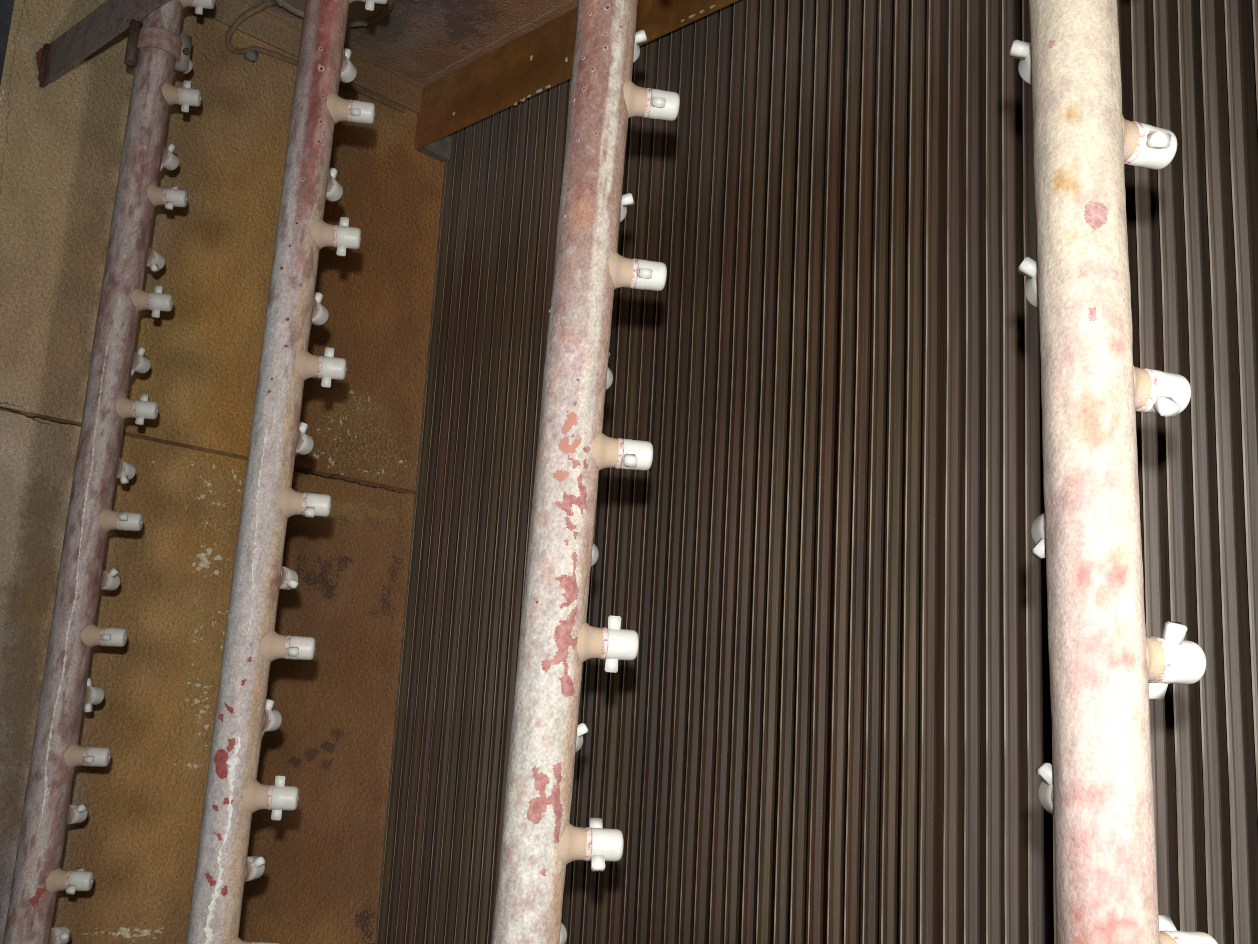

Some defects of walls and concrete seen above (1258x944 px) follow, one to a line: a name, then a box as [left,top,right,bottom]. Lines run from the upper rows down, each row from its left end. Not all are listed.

leakage [296,551,352,600]